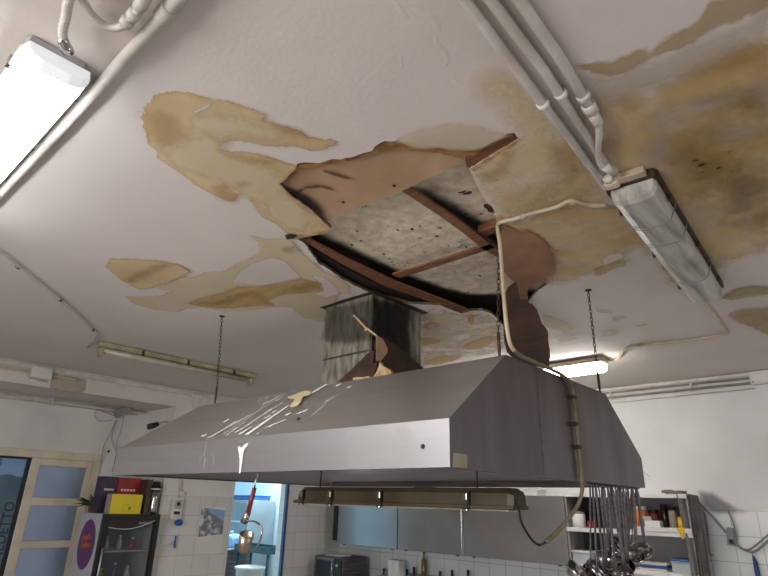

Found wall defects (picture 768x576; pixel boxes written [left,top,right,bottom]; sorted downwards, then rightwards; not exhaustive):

water stain [106,92,350,321]
spalling [309,230,503,325]
spalling [414,187,498,247]
water stain [478,84,640,279]
water stain [582,0,768,268]
water stain [724,286,768,300]